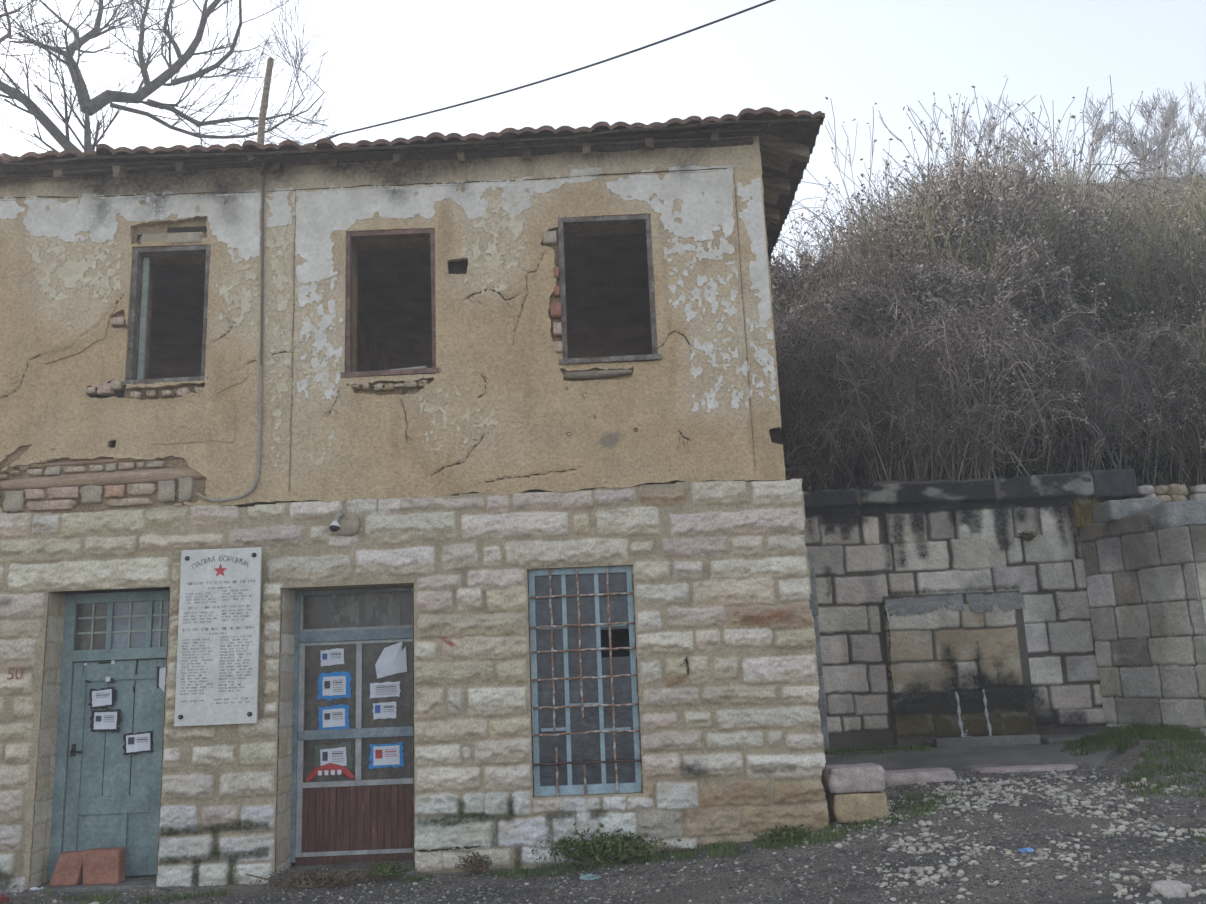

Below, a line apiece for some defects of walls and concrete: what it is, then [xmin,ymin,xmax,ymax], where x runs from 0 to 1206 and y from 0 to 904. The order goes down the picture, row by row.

peeling [0,165,778,468]
crack [462,255,543,345]
flaking render [0,441,206,514]
crack [431,435,484,476]
crack [486,469,575,482]
water stain [805,494,1078,567]
water stain [901,649,1044,714]